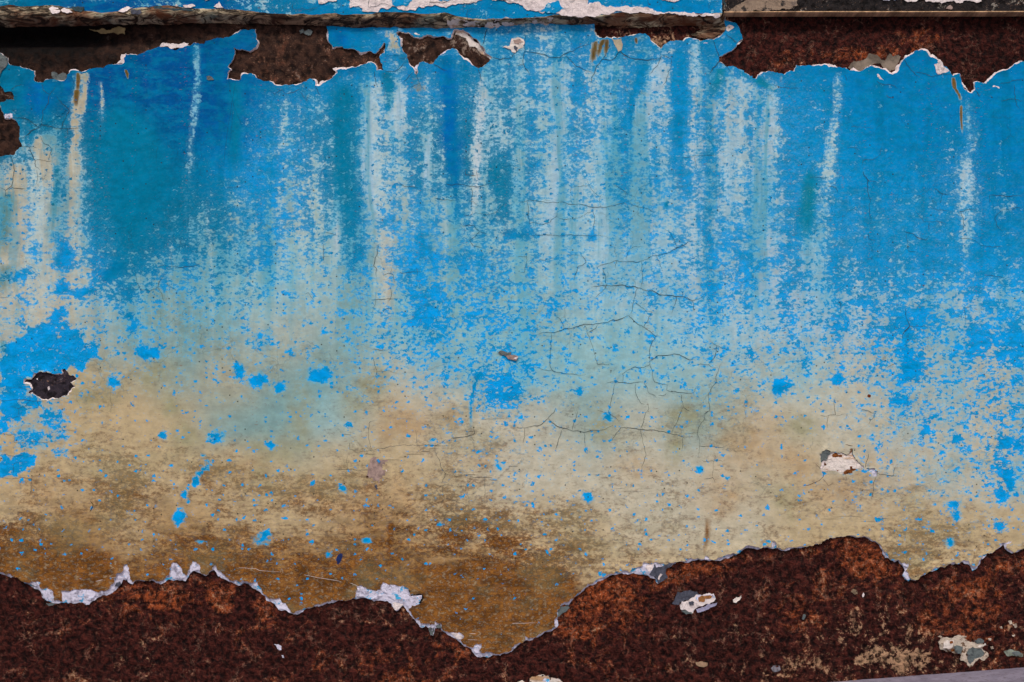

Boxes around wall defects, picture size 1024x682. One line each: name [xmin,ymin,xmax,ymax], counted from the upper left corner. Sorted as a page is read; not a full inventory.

leakage [0,43,207,297]
peeling [0,4,385,157]
leakage [317,55,577,337]
peeling [349,0,1024,93]
leakage [621,42,783,246]
leakage [792,71,846,254]
leakage [950,94,992,278]
peeling [24,369,76,400]
crack [334,183,726,504]
peeling [820,448,878,476]
rust [404,532,618,654]
peeling [0,535,1024,682]